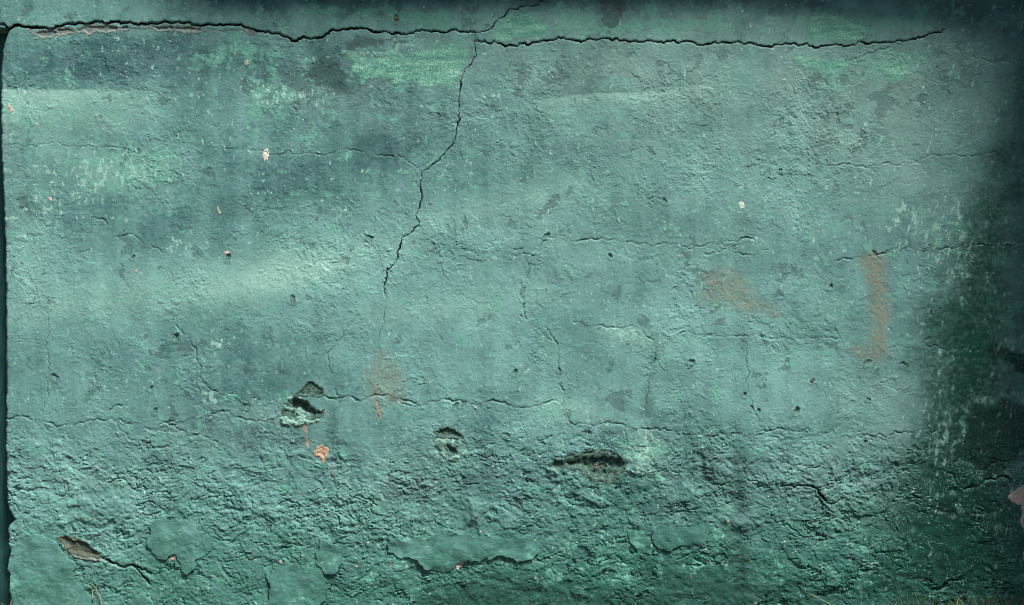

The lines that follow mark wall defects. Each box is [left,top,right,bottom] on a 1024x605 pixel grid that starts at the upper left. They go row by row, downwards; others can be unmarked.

crack [2,0,947,293]
spalling [279,381,327,428]
spalling [314,445,329,463]
spalling [434,426,464,462]
spalling [543,429,627,509]
spalling [56,534,104,562]